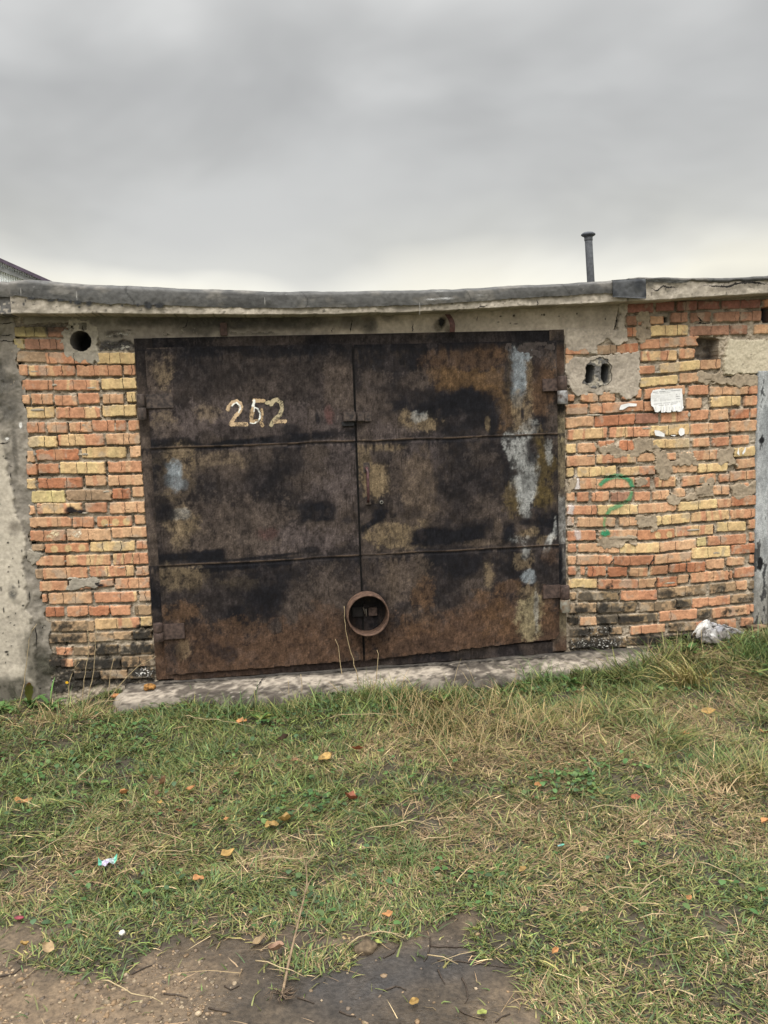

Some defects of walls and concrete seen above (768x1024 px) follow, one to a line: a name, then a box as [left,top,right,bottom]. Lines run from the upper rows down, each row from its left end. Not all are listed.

damp [0,623,156,702]
damp [568,602,696,651]